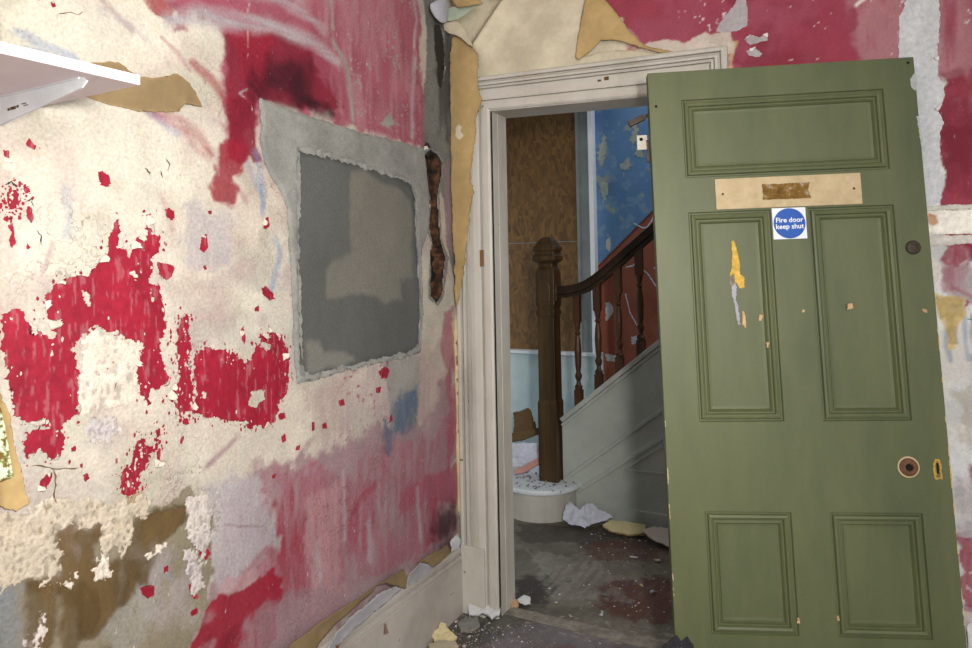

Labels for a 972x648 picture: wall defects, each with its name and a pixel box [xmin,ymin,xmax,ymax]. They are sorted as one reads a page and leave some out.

spalling [424,146,450,306]
peeling [0,208,293,498]
peeling [376,367,390,393]
damp [28,505,186,648]
peeling [140,585,155,599]